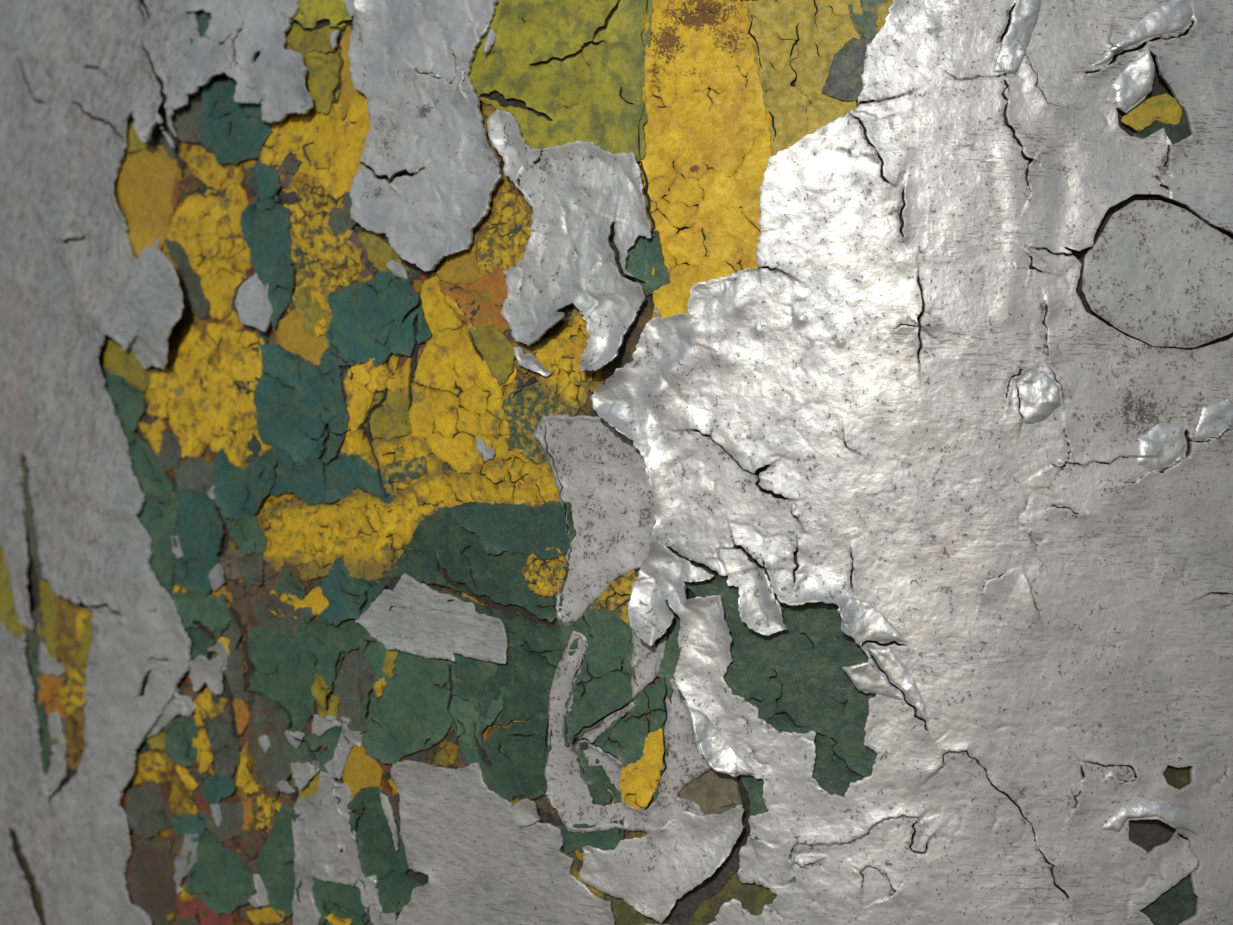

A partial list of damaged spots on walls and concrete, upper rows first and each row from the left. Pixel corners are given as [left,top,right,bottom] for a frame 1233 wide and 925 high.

crack [1001,4,1015,41]
crack [997,75,1037,186]
peeling [1121,93,1191,157]
crack [855,98,906,237]
crack [1030,248,1079,272]
crack [897,276,930,363]
crack [1006,369,1023,417]
peeling [99,0,893,925]
peeling [0,458,93,800]
peeling [1163,765,1192,789]
peeling [1128,819,1182,853]
peeling [1140,874,1197,925]